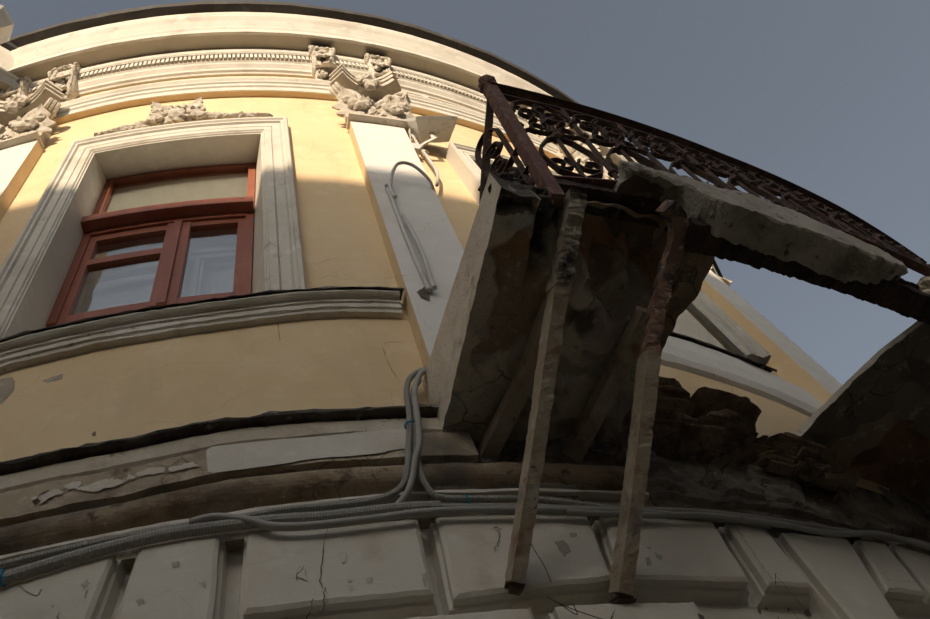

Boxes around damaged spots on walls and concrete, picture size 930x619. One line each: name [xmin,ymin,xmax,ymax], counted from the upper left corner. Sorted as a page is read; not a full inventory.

spalling [488,172,556,227]
spalling [617,161,908,285]
spalling [417,287,430,301]
spalling [655,376,762,432]
peeling [30,428,406,503]
flaking render [474,439,526,463]
flaking render [544,438,628,466]
spalling [768,432,827,454]
flaking render [646,451,930,556]
crack [296,529,328,619]